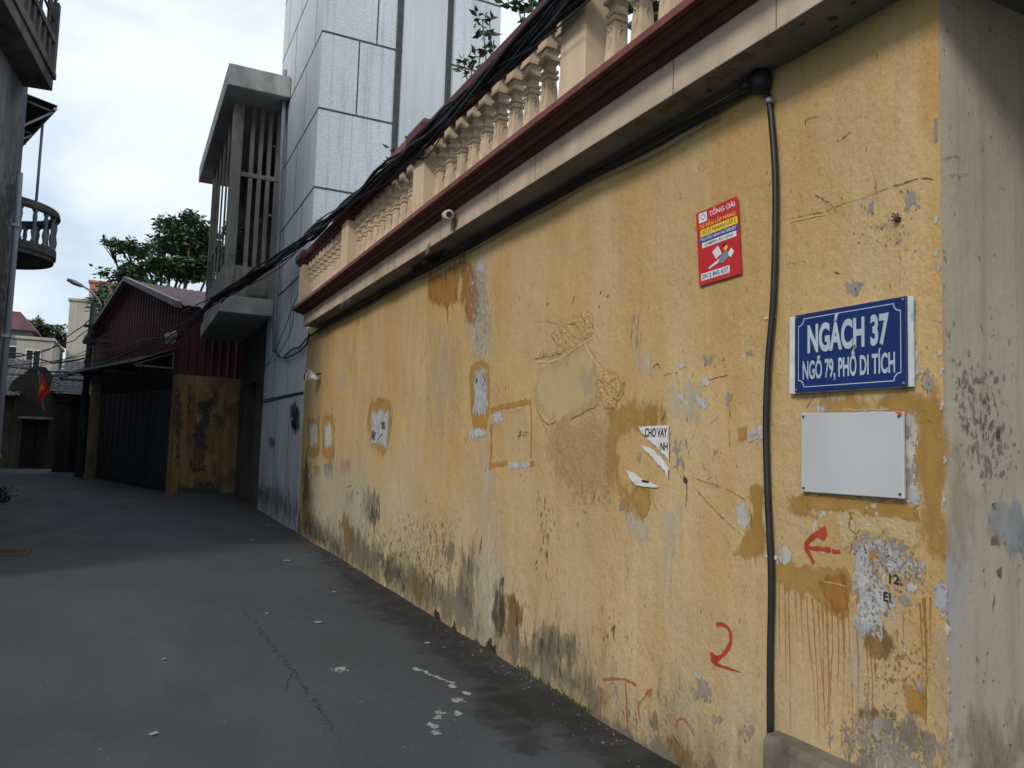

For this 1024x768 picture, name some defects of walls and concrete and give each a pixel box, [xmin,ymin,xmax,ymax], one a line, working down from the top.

crack [790,116,968,222]
water stain [175,385,224,493]
peeling [370,407,389,449]
peeling [467,410,503,441]
water stain [254,452,626,755]
corrosion [774,559,904,747]
peeling [775,499,951,635]
corrosion [919,597,931,725]